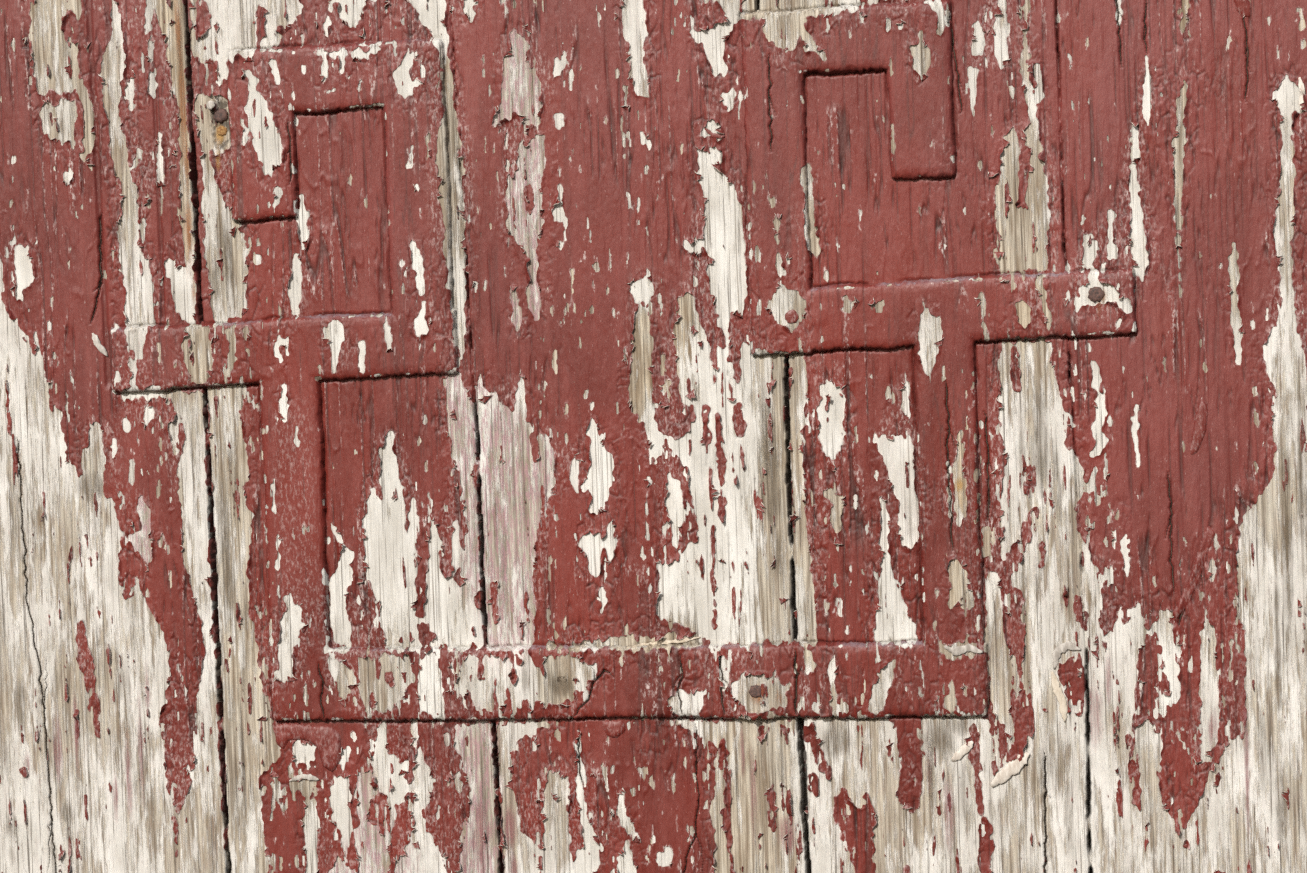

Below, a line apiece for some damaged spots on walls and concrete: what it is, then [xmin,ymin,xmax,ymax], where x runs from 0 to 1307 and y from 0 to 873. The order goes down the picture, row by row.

peeling [11,0,95,171]
peeling [273,194,312,363]
peeling [315,313,393,381]
peeling [392,240,436,352]
peeling [476,23,594,348]
peeling [596,0,656,174]
peeling [918,302,946,382]
peeling [962,0,1056,330]
peeling [1062,55,1158,335]
peeling [569,390,617,613]
crack [17,439,56,873]
peeling [601,756,673,873]